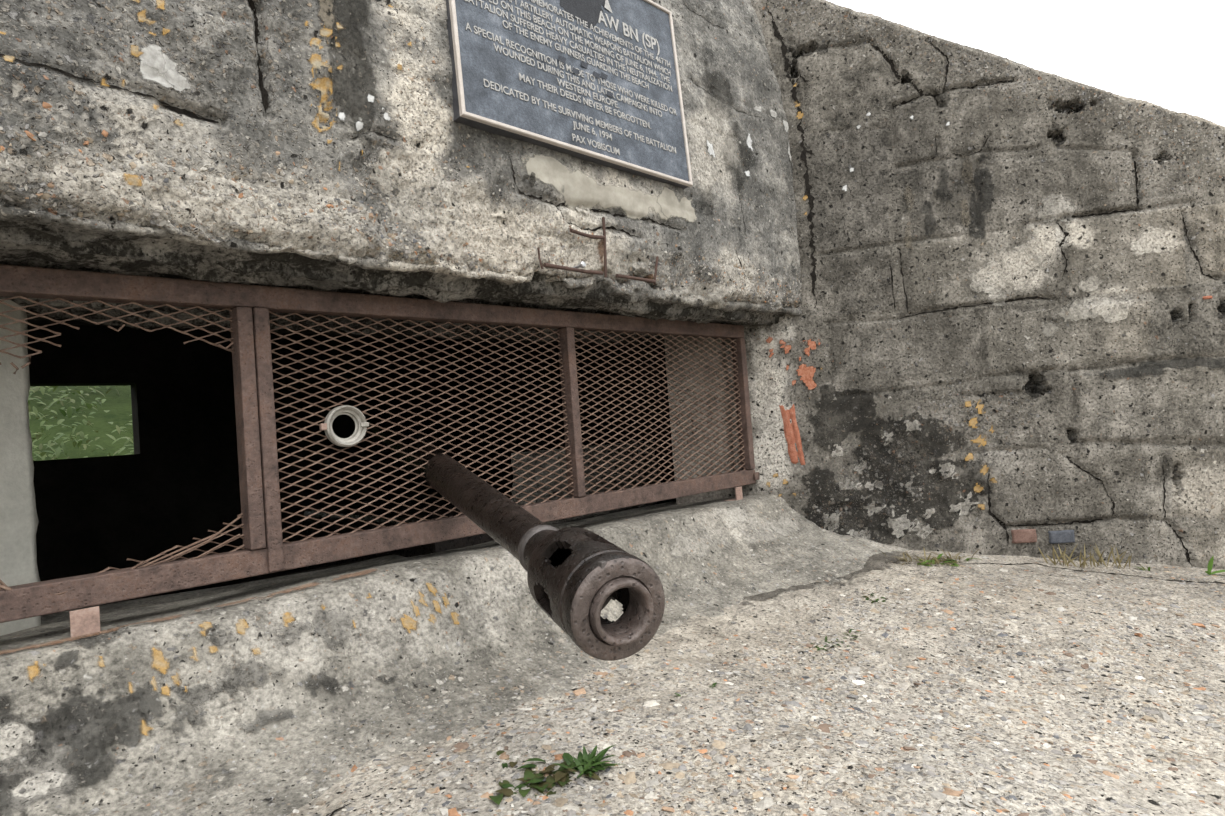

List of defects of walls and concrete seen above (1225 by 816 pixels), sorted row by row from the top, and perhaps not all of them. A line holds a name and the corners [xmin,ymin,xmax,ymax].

crack [0,53,219,123]
crack [248,0,269,111]
leakage [318,0,376,146]
crack [766,3,817,307]
leakage [0,624,293,816]
leakage [276,607,352,697]
leakage [375,675,397,683]